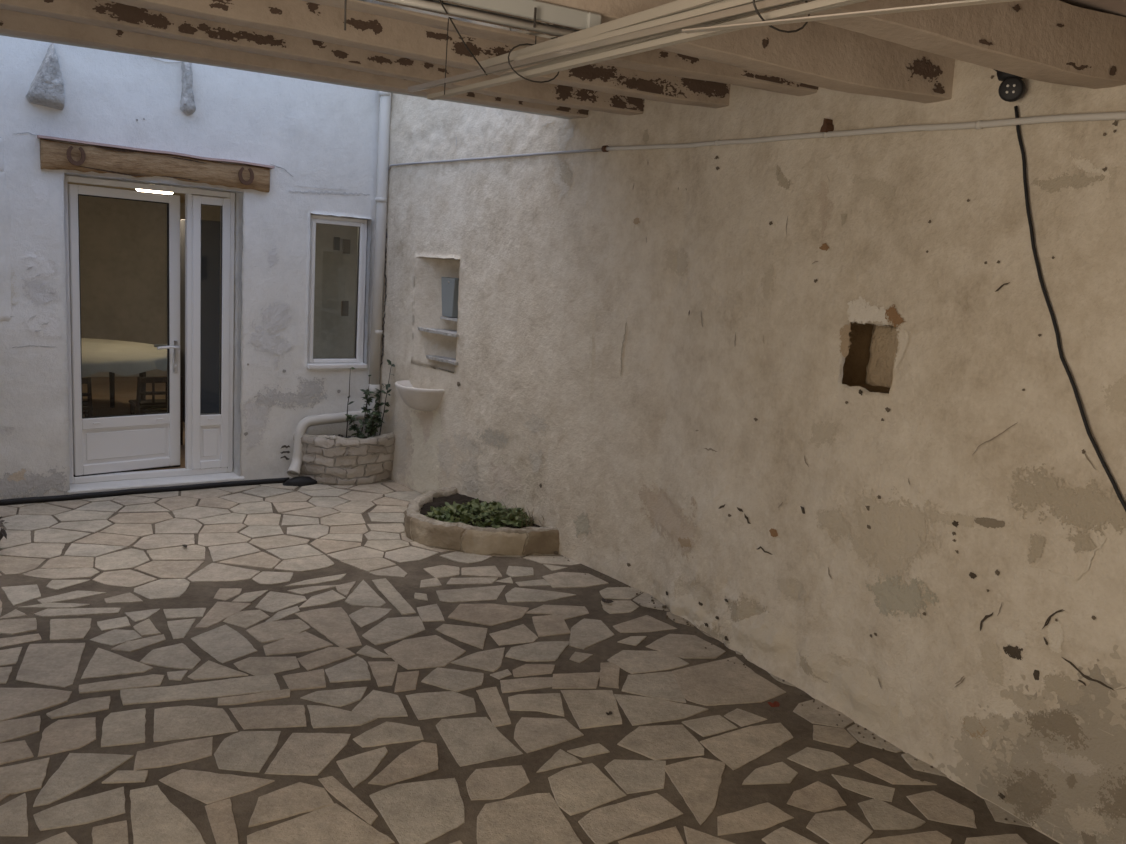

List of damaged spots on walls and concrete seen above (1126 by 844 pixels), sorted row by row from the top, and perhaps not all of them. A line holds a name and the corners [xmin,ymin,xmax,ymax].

peeling [92,0,286,48]
peeling [343,18,383,35]
peeling [312,40,449,80]
peeling [426,31,511,58]
peeling [659,51,699,64]
peeling [906,56,945,94]
peeling [555,64,818,149]
peeling [839,296,911,370]
water stain [929,640,1126,844]